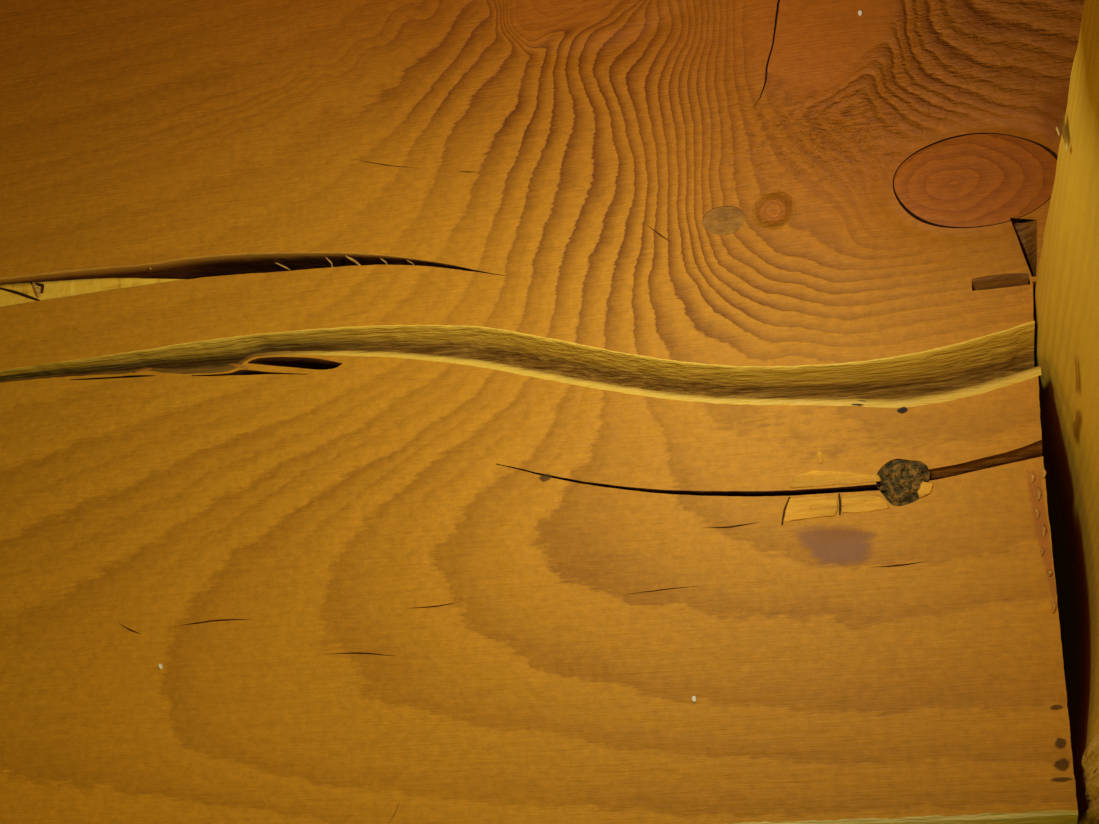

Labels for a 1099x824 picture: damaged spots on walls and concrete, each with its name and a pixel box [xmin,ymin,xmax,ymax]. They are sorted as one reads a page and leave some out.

crack [754,0,780,107]
crack [0,251,506,307]
crack [0,321,1042,408]
crack [924,440,1044,482]
crack [496,464,886,528]